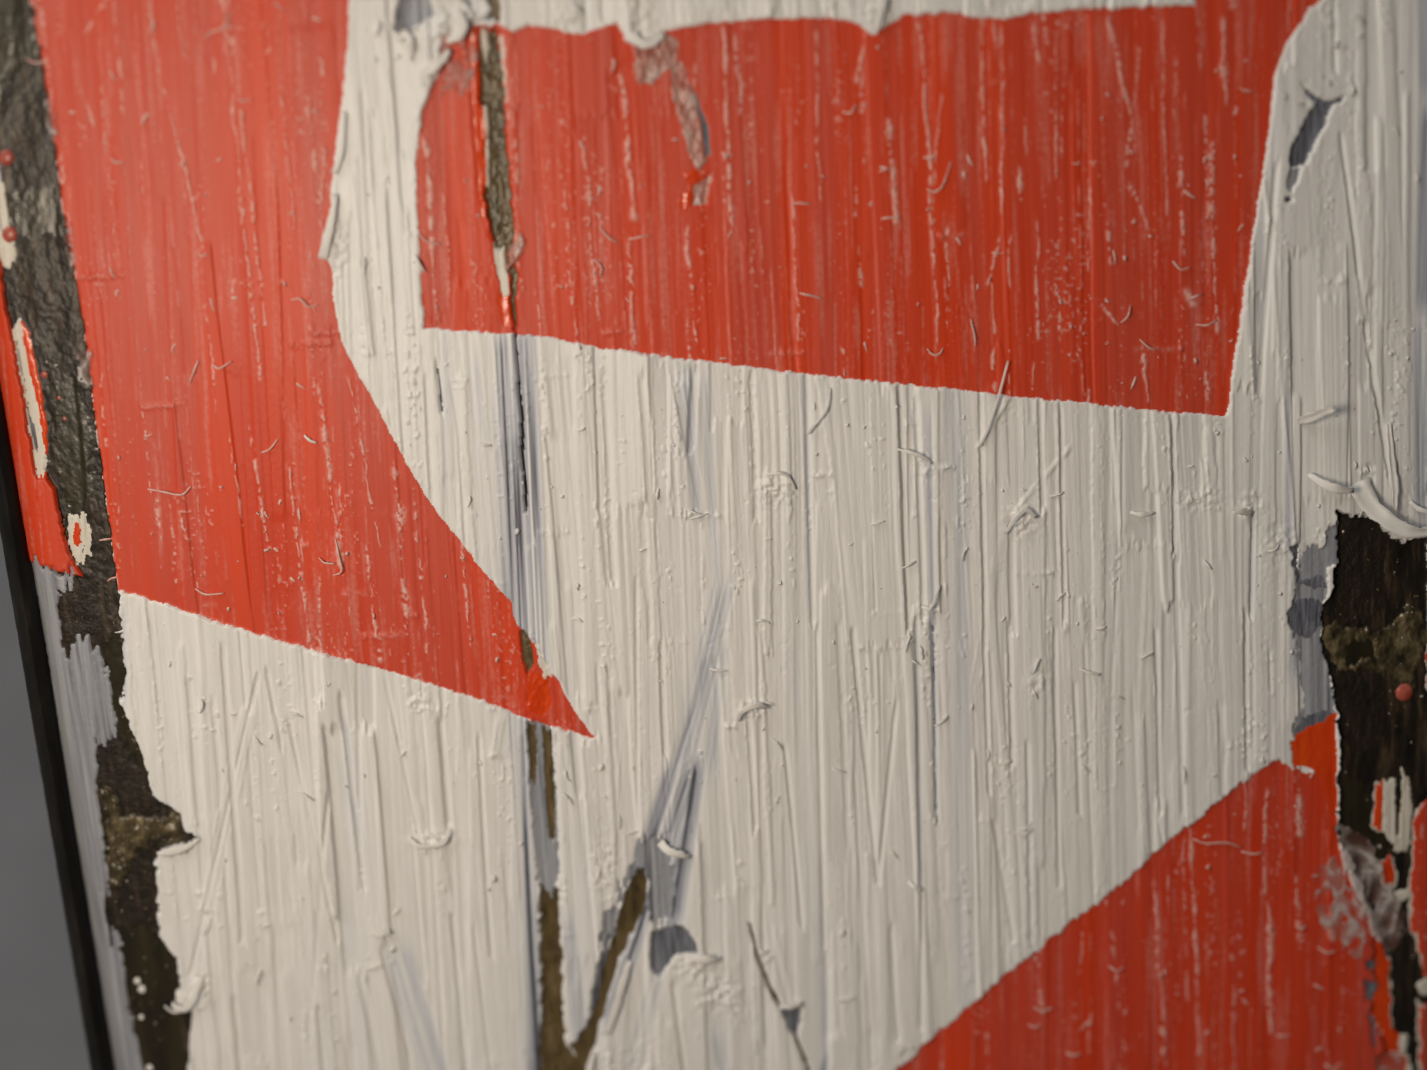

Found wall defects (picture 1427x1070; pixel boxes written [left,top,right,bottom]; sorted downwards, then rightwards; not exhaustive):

peeling [693,175,712,206]
spalling [1285,85,1343,202]
peeling [0,0,199,1070]
peeling [1287,423,1427,1070]